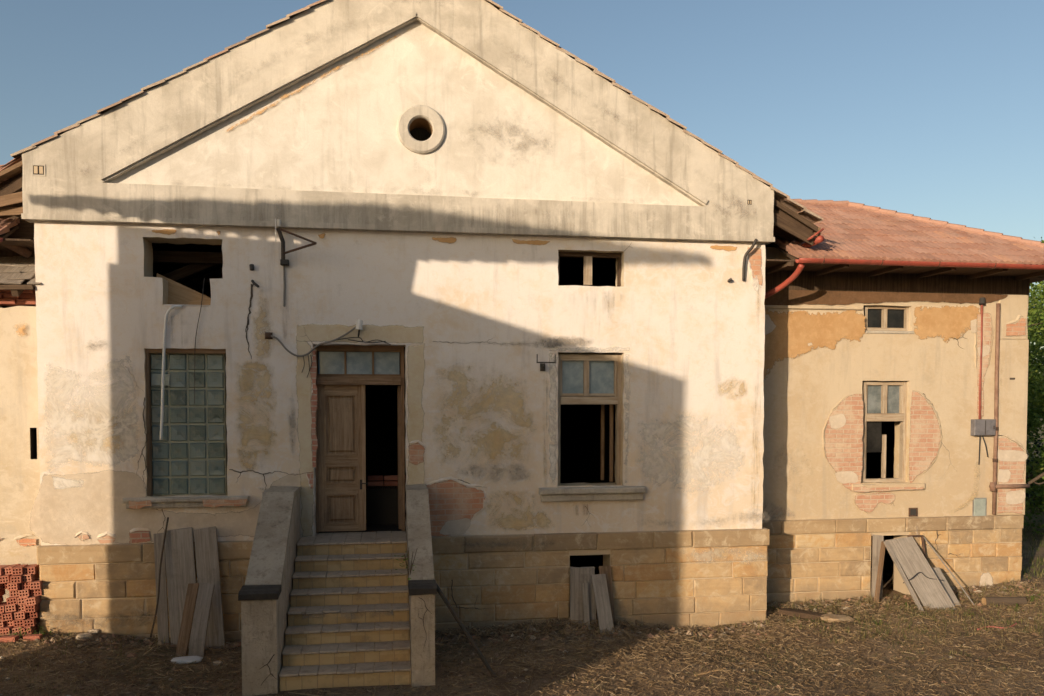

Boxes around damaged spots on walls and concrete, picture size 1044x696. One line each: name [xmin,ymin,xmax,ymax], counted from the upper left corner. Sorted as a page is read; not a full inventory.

peeling [710,245,1008,417]
flaking render [1006,315,1026,336]
peeling [0,358,262,546]
crack [229,469,309,490]
flaking render [426,476,486,536]
flaking render [822,389,943,514]
flaking render [997,434,1028,514]